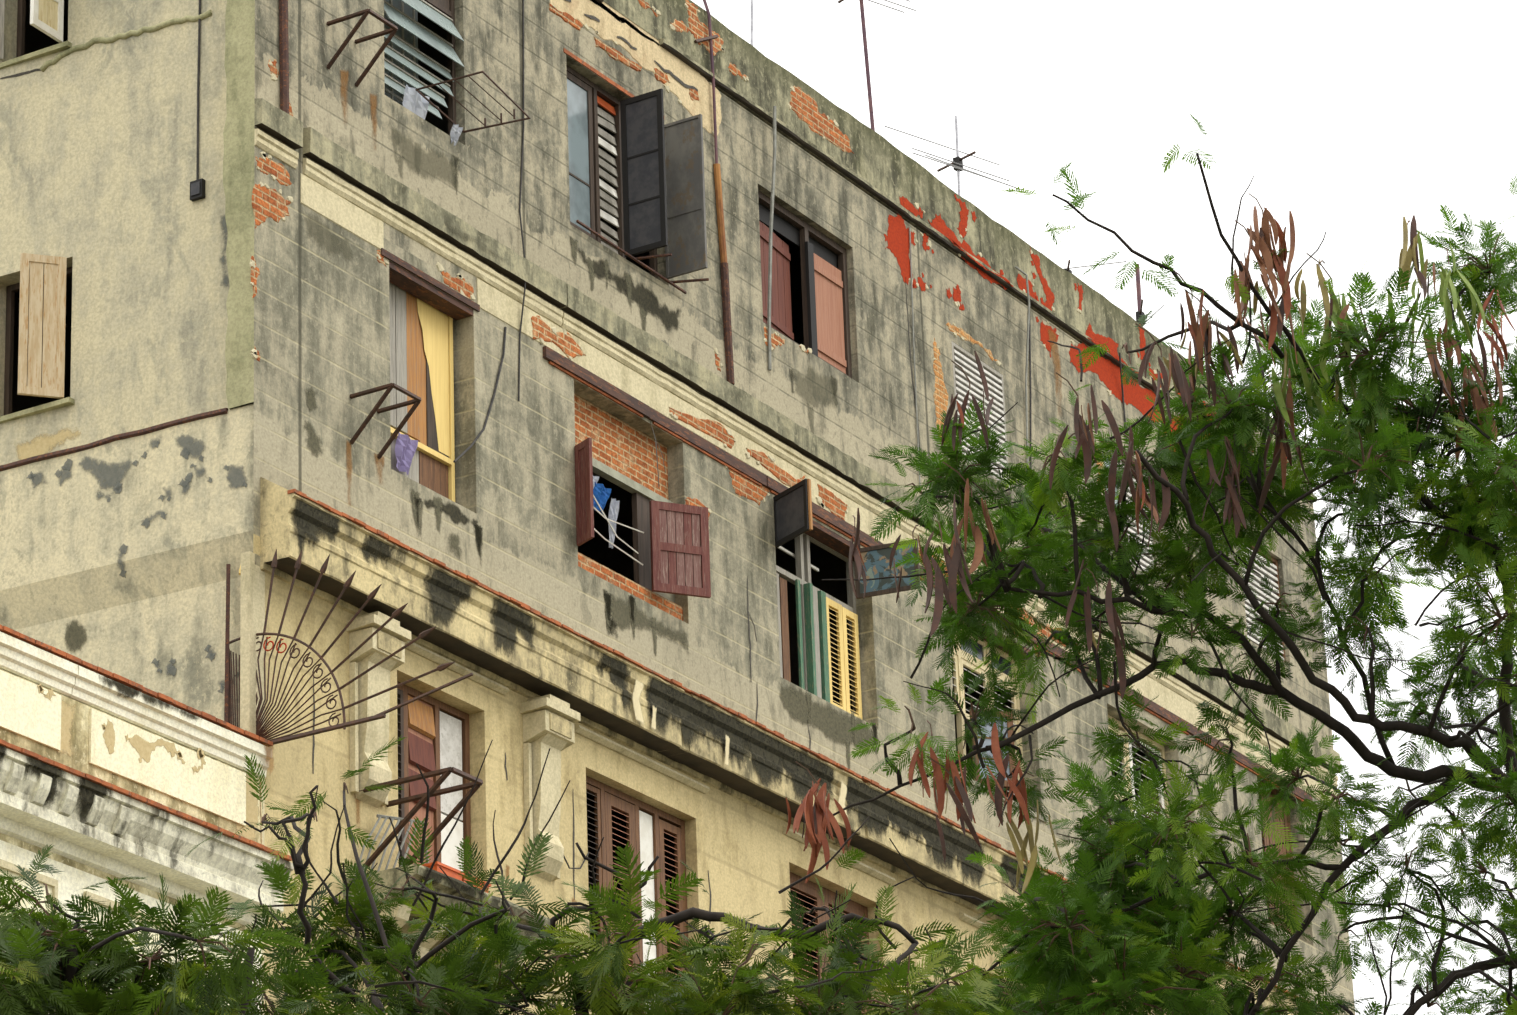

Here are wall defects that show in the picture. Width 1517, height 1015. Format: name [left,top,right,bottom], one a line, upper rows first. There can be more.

spalling [549,0,749,137]
spalling [788,86,853,153]
spalling [252,151,293,229]
spalling [531,315,586,361]
leakage [570,237,680,350]
peeling [884,194,1186,451]
leakage [291,499,339,554]
leakage [411,490,483,558]
leakage [424,568,470,625]
leakage [490,601,533,653]
peeling [102,720,206,774]
leakage [596,653,1064,913]